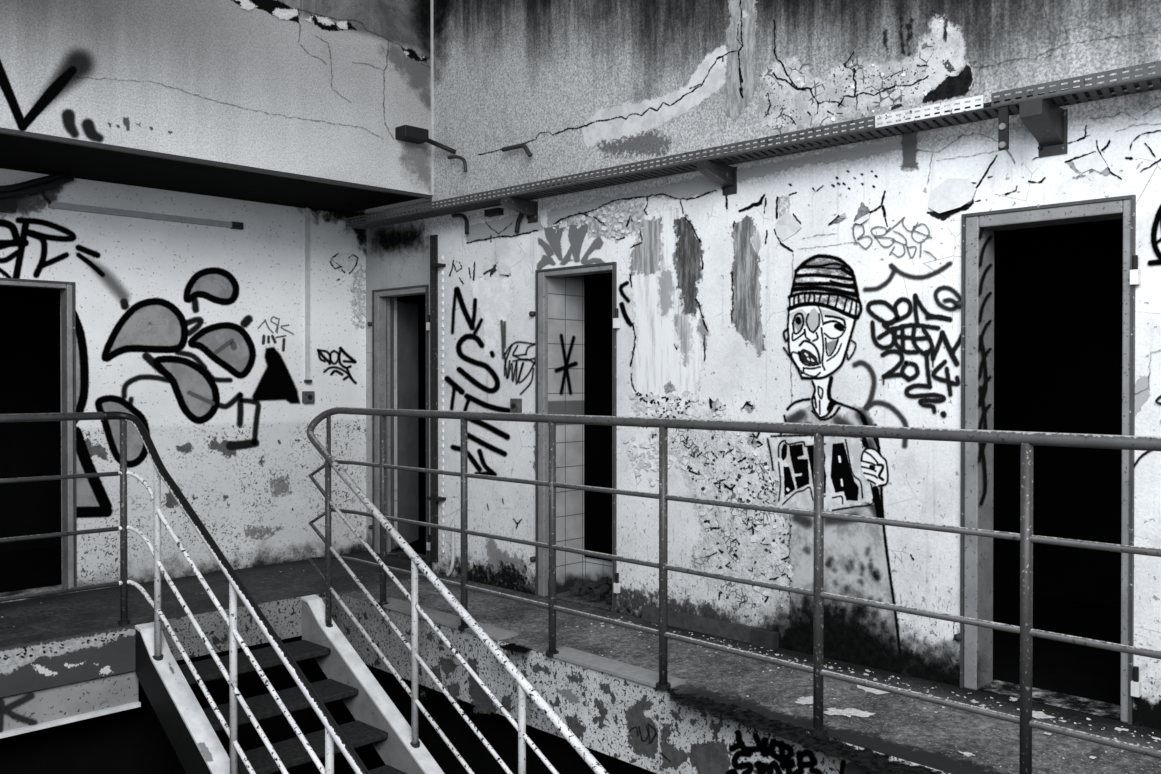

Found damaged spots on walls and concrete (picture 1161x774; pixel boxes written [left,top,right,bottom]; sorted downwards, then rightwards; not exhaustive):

spalling [233,0,357,31]
damp [883,16,914,56]
crack [97,8,405,138]
crack [478,0,929,155]
peeling [757,14,976,139]
peeling [737,132,928,182]
crack [928,134,1046,195]
crack [1068,104,1161,172]
peeling [466,176,801,626]
peeling [0,628,135,676]
peeling [430,655,513,714]
spalling [500,642,552,678]